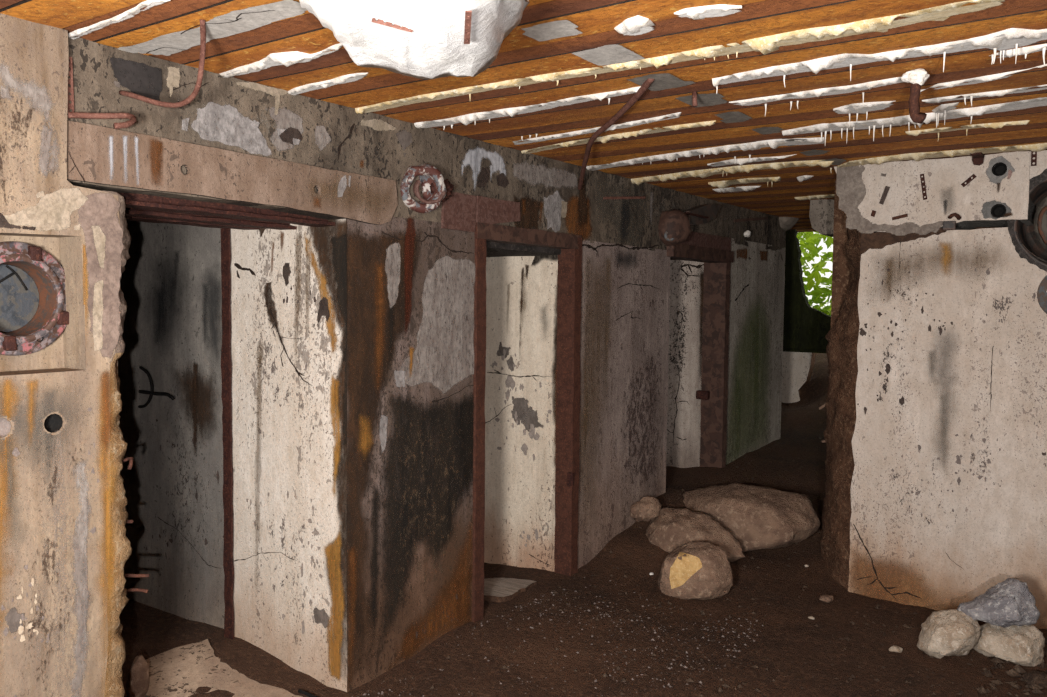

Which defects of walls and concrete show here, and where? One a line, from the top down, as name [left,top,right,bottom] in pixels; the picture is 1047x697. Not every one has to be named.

peeling [182,102,336,157]
rust [264,233,284,340]
peeling [394,256,475,394]
spalling [800,150,953,415]
rust [0,437,12,541]
rust [100,373,113,599]
leakage [181,363,213,442]
rust [296,218,420,679]
leakage [371,396,474,629]
crack [431,370,552,403]
peeling [490,342,552,461]
crack [853,524,922,600]